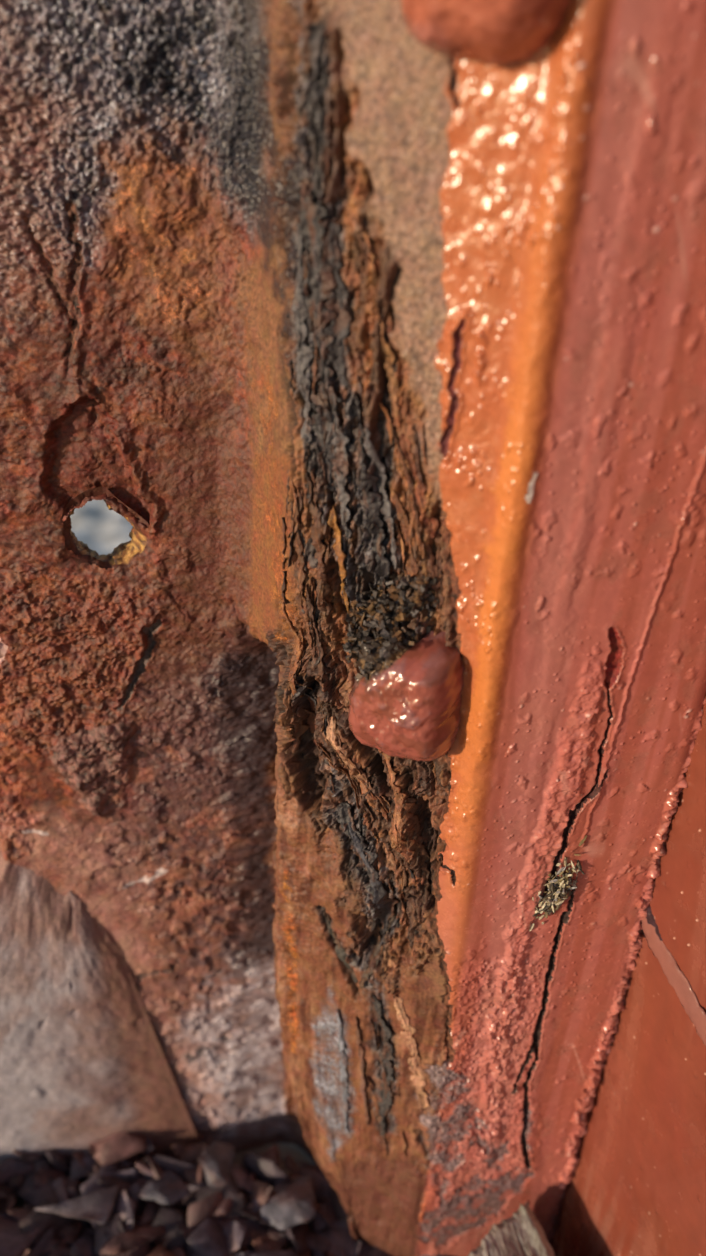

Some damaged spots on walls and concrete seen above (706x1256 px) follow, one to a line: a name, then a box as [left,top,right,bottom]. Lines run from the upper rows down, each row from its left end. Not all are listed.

corrosion [113,159,209,323]
crack [440,319,466,457]
corrosion [60,486,150,570]
peeling [439,516,465,668]
corrosion [51,721,133,818]
crack [511,627,624,1170]
peeling [416,752,534,1245]